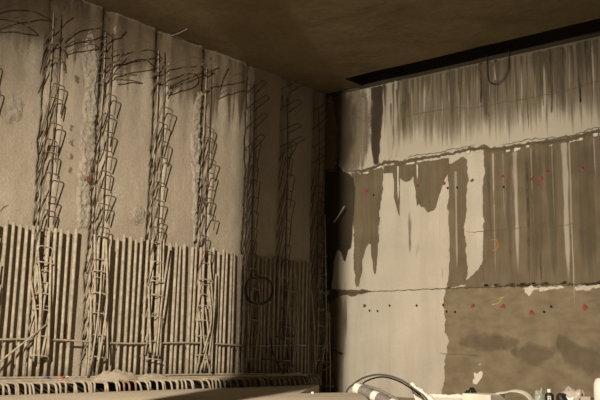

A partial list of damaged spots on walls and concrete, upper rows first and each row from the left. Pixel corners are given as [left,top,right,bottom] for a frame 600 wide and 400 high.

spalling [0,31,308,382]
spalling [317,200,333,393]
crack [327,289,378,300]
water stain [322,37,600,400]
crack [348,127,600,172]
crack [395,281,600,291]